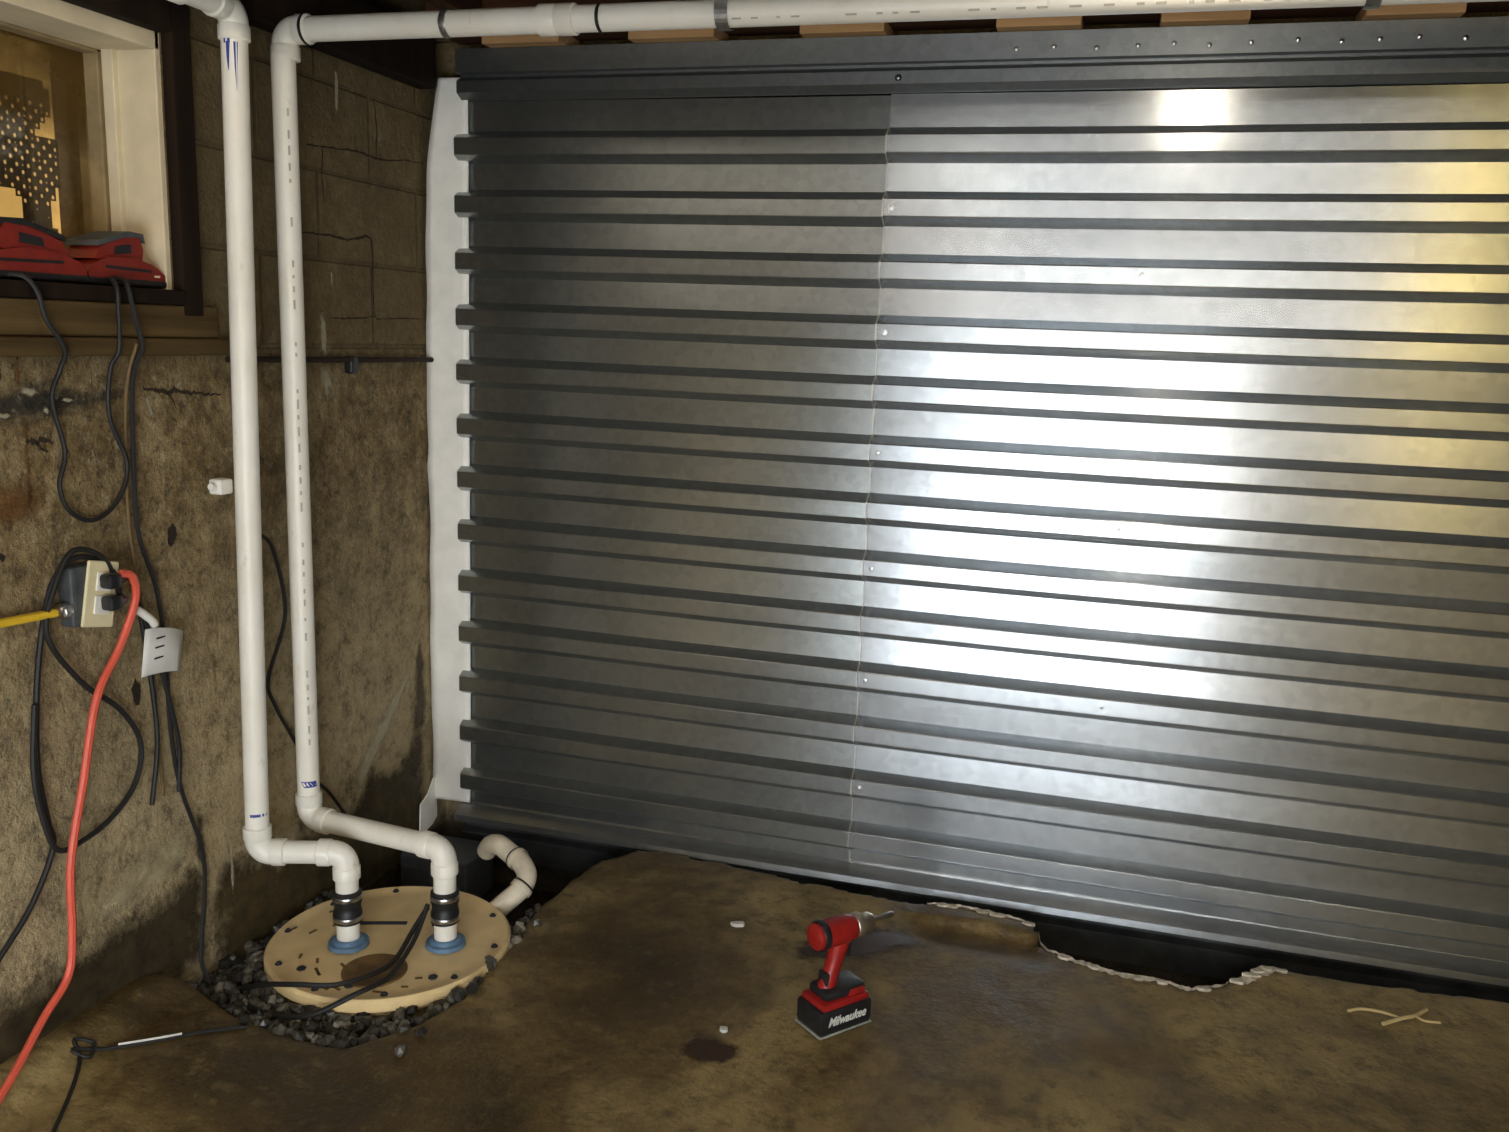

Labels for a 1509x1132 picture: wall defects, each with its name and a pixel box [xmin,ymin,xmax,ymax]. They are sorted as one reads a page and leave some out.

leakage [351,646,425,831]
leakage [301,832,404,891]
spalling [927,902,1288,992]
leakage [680,1038,737,1063]